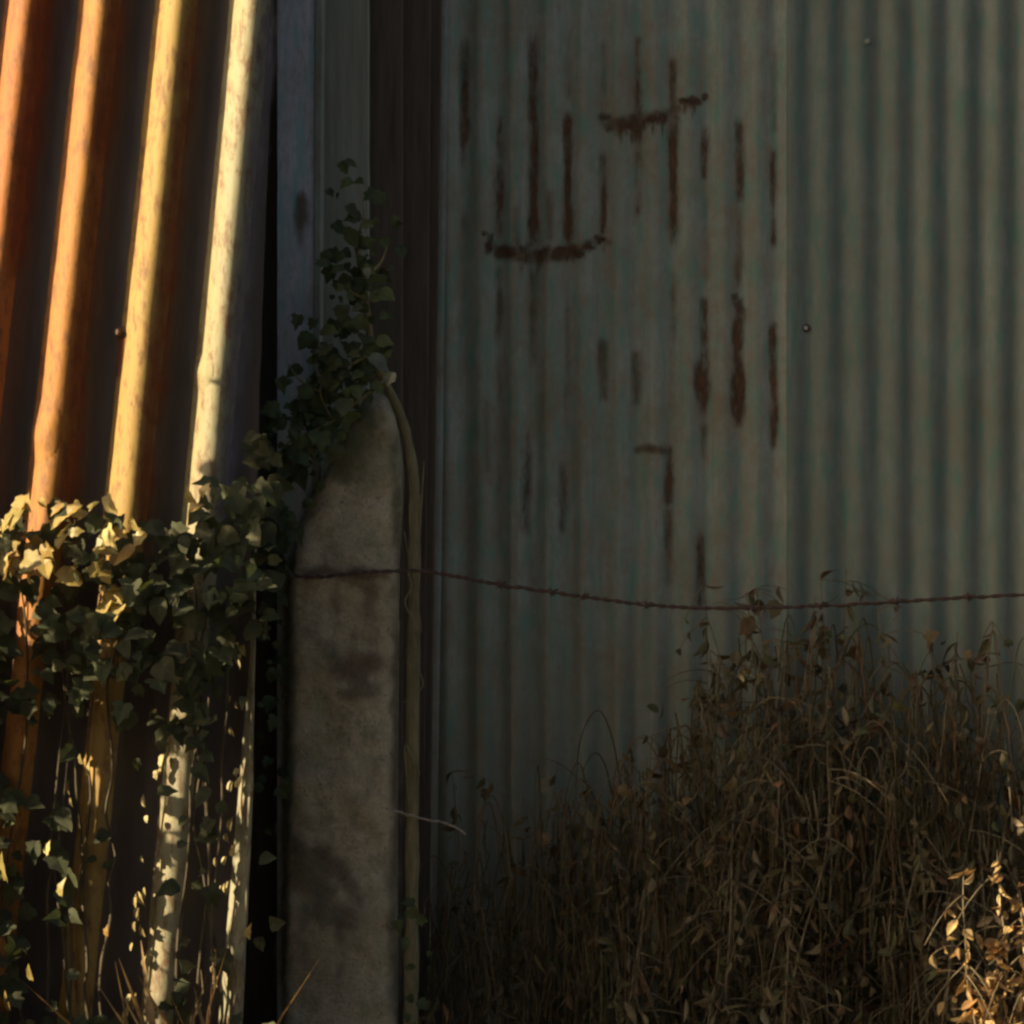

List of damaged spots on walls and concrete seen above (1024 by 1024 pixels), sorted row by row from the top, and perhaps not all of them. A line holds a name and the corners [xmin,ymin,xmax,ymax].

corrosion [460,49,469,151]
corrosion [482,43,607,265]
corrosion [600,60,708,237]
corrosion [736,123,744,200]
corrosion [694,359,709,411]
corrosion [731,294,745,423]
corrosion [769,326,778,447]
corrosion [636,445,673,504]